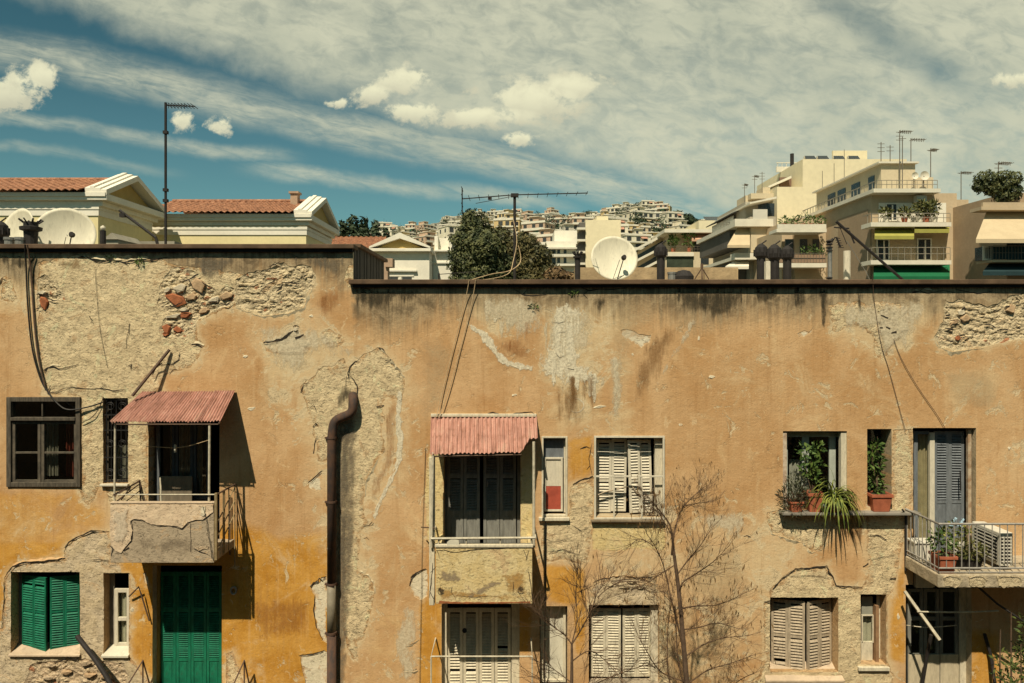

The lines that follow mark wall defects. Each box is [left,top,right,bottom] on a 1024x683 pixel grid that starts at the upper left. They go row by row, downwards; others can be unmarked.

peeling [470,303,602,402]
water stain [676,288,742,351]
peeling [828,301,905,360]
spalling [934,293,1024,356]
peeling [0,254,316,683]
crack [190,507,212,558]
peeling [300,329,405,660]
peeling [751,429,913,683]
peeling [299,576,327,683]